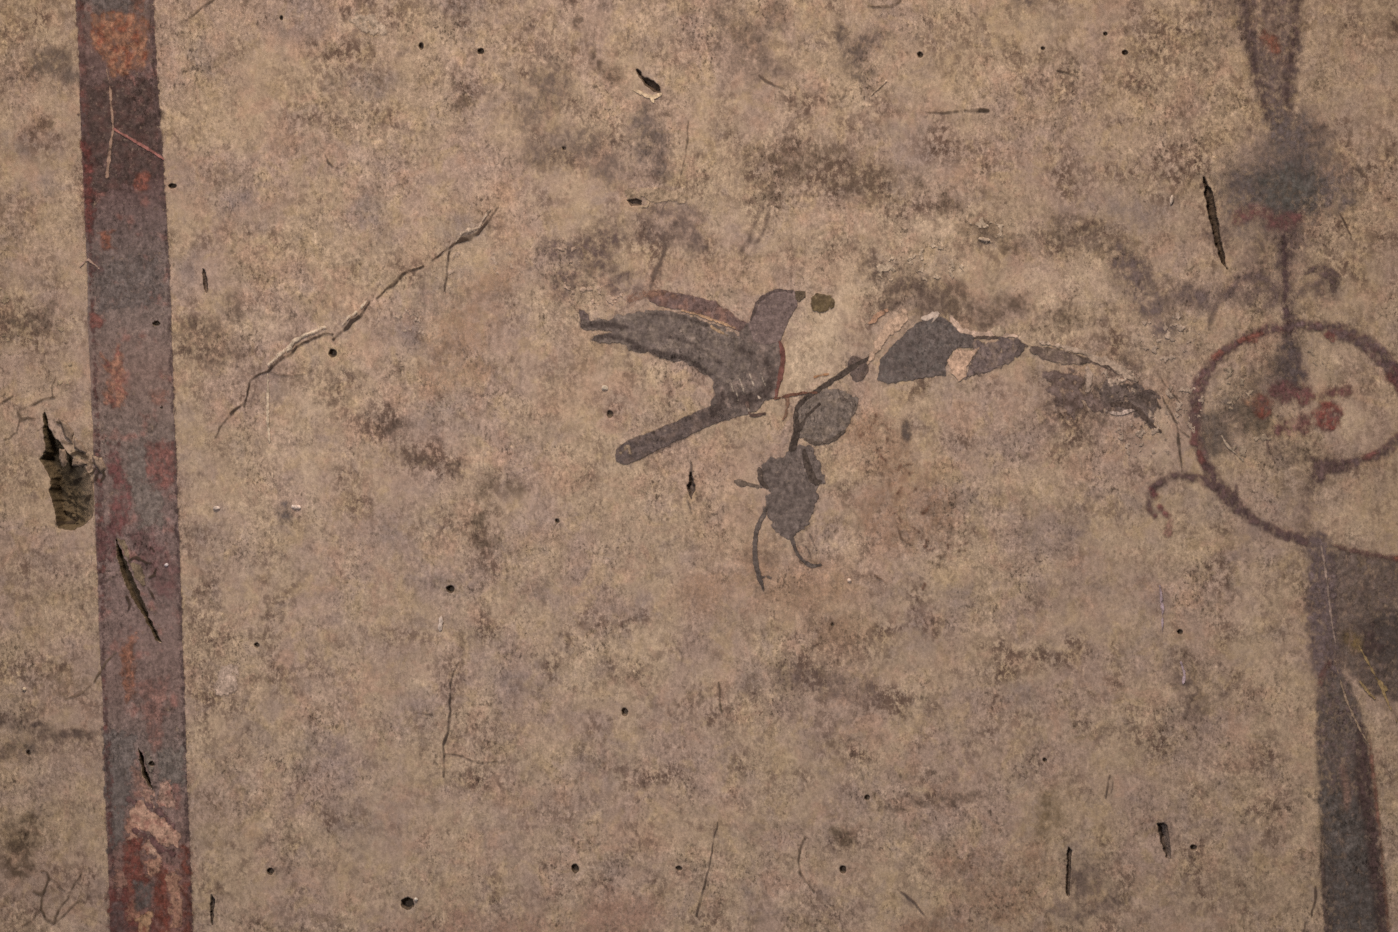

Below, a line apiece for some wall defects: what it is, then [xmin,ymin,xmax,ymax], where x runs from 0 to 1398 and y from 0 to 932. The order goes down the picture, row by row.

crack [215,208,496,437]
flaking render [867,309,1018,381]
flaking render [39,412,168,661]